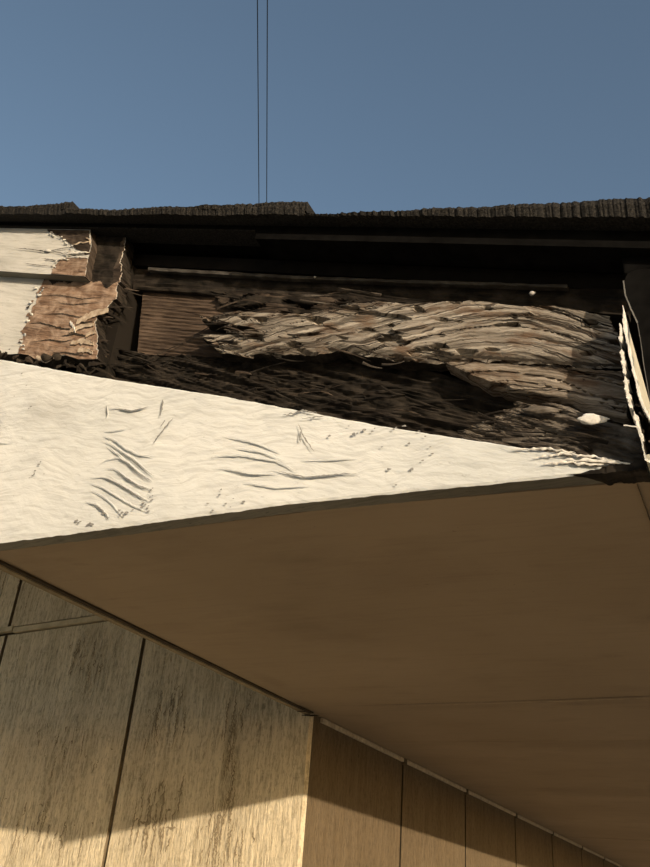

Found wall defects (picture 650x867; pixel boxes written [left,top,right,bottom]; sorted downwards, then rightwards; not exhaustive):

peeling [18,229,125,363]
peeling [617,307,650,463]
peeling [510,447,630,467]